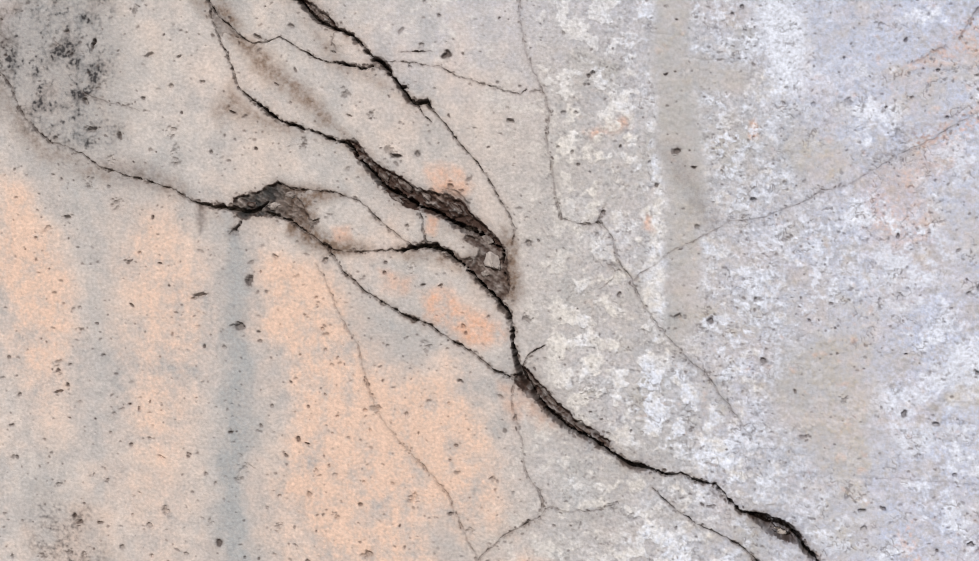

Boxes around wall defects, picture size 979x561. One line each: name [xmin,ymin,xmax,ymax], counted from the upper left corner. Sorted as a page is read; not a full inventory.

crack [0,71,269,235]
crack [205,0,979,561]